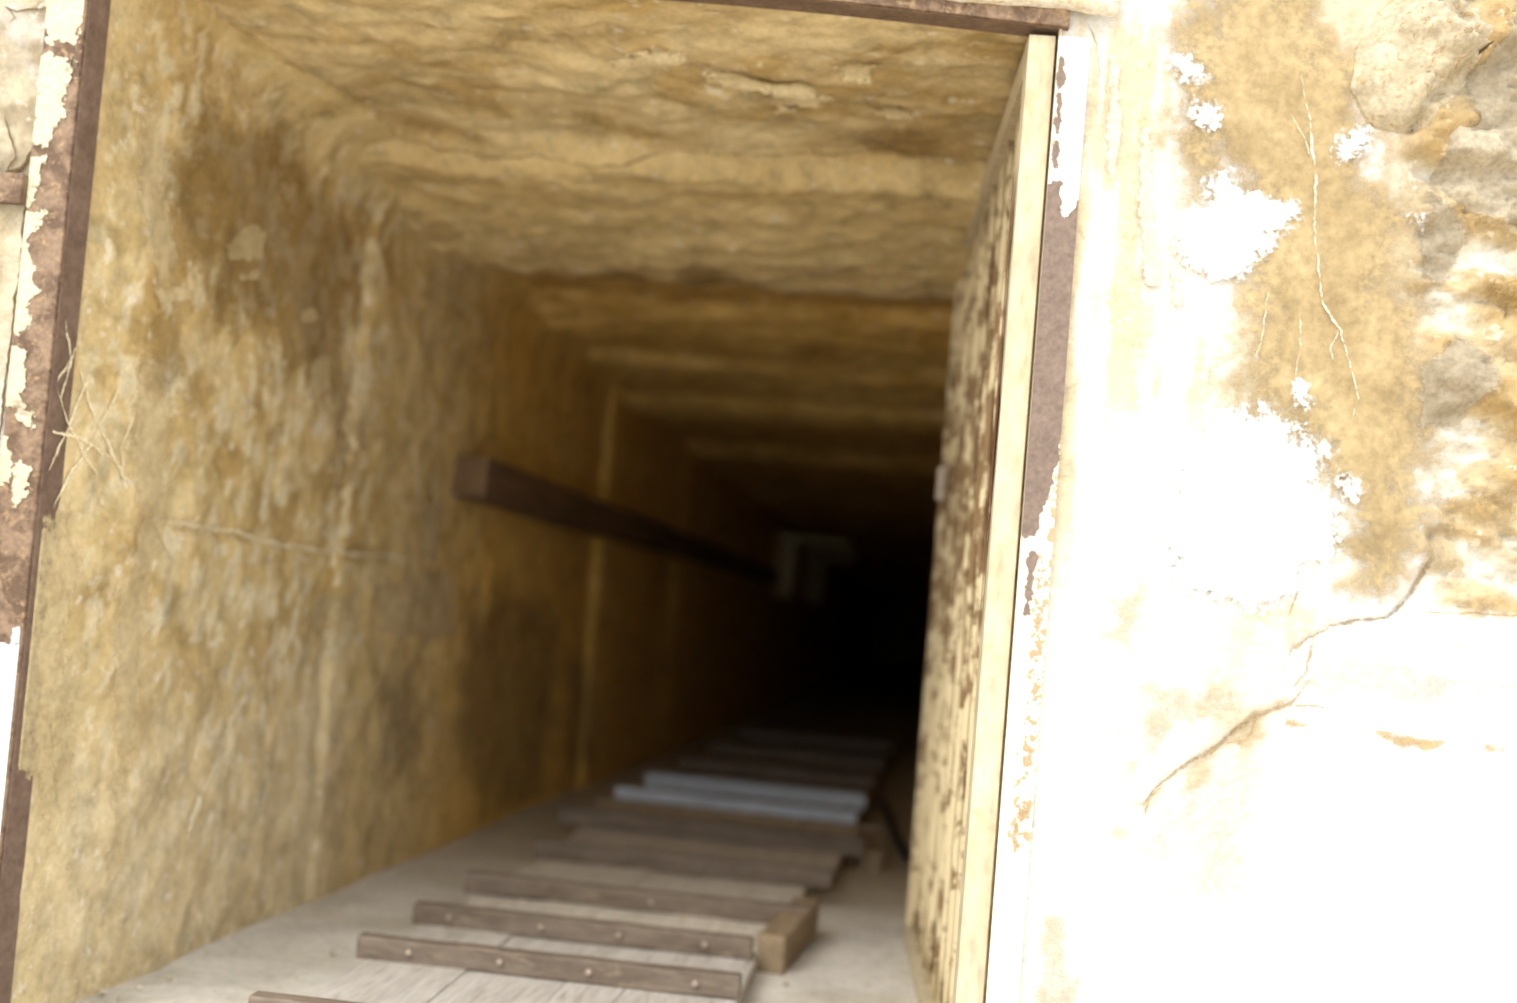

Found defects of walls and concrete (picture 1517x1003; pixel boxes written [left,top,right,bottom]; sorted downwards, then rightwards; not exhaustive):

water stain [1105,55,1122,185]
water stain [1136,127,1184,305]
peeling [1166,53,1224,132]
peeling [1166,166,1302,301]
water stain [1168,0,1445,598]
peeling [1330,125,1373,163]
rust [1007,55,1079,853]
crack [1143,537,1517,818]